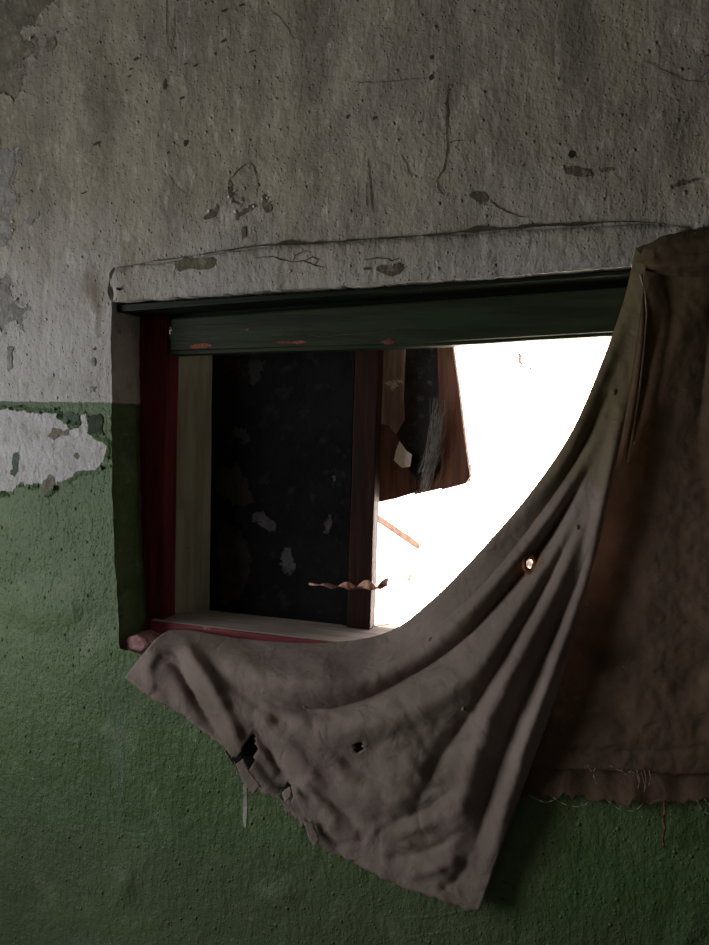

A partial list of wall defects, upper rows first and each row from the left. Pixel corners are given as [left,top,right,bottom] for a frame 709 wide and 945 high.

peeling [0,0,60,104]
crack [436,83,463,193]
peeling [0,137,48,253]
crack [107,199,670,302]
peeling [0,272,33,372]
peeling [0,405,112,499]
flaking render [462,339,611,539]
peeling [376,564,411,590]